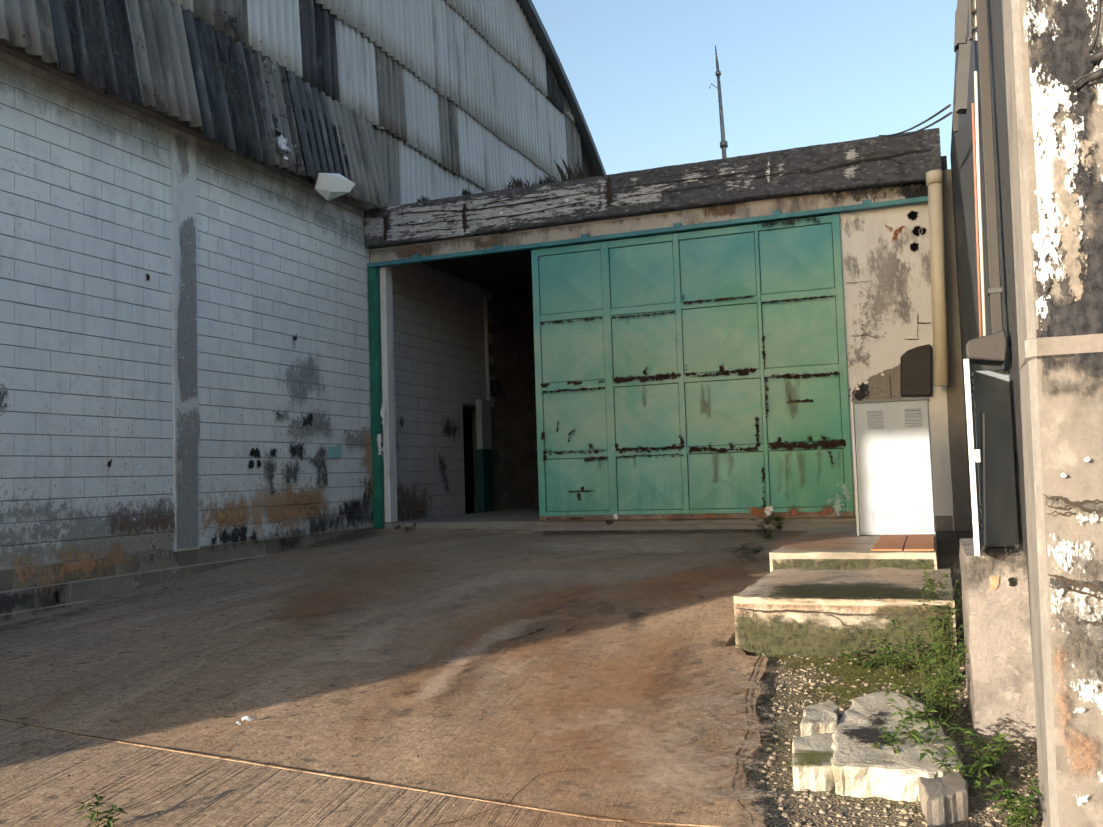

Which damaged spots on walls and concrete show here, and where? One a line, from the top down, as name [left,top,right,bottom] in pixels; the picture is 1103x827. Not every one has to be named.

peeling [1023,0,1067,44]
peeling [1086,0,1103,111]
peeling [176,136,189,174]
peeling [1030,64,1103,330]
damp [851,239,911,344]
peeling [0,216,200,575]
corrosion [540,336,846,468]
damp [210,427,385,550]
corrosion [733,467,766,517]
crack [1043,494,1103,516]
crack [1048,574,1103,626]